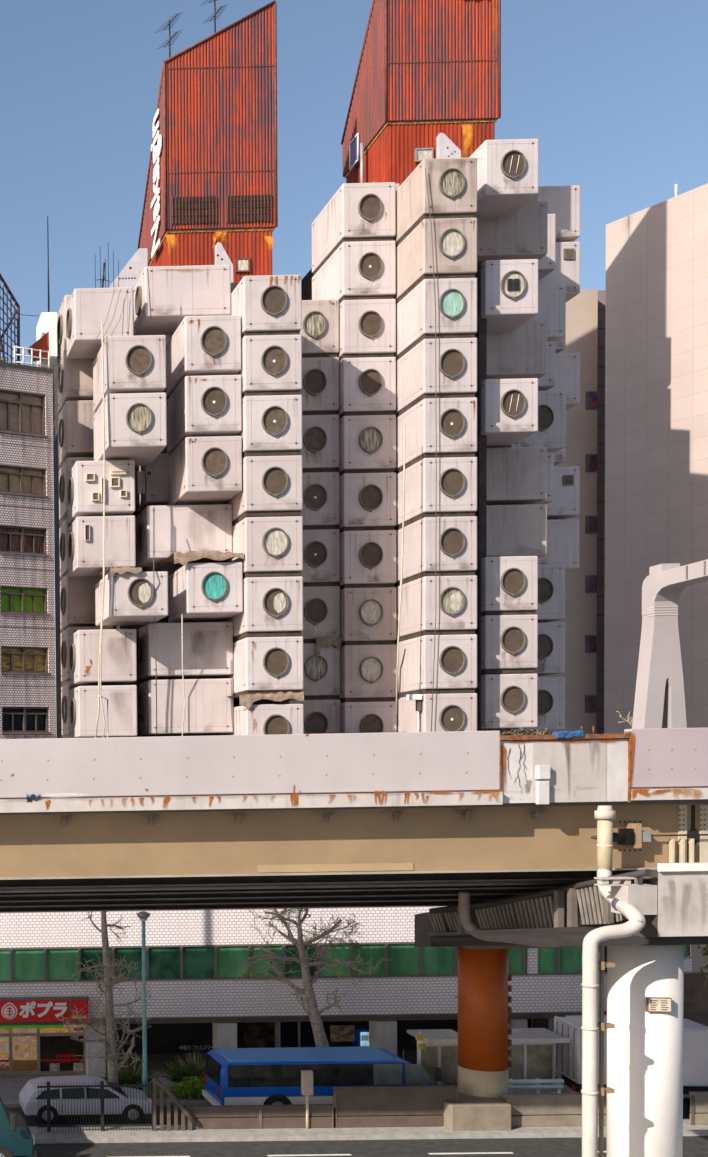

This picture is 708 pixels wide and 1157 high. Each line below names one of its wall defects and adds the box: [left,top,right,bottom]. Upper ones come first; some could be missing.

crack [507,743,527,794]
corrosion [501,733,701,799]
corrosion [89,789,170,806]
corrosion [404,790,505,803]